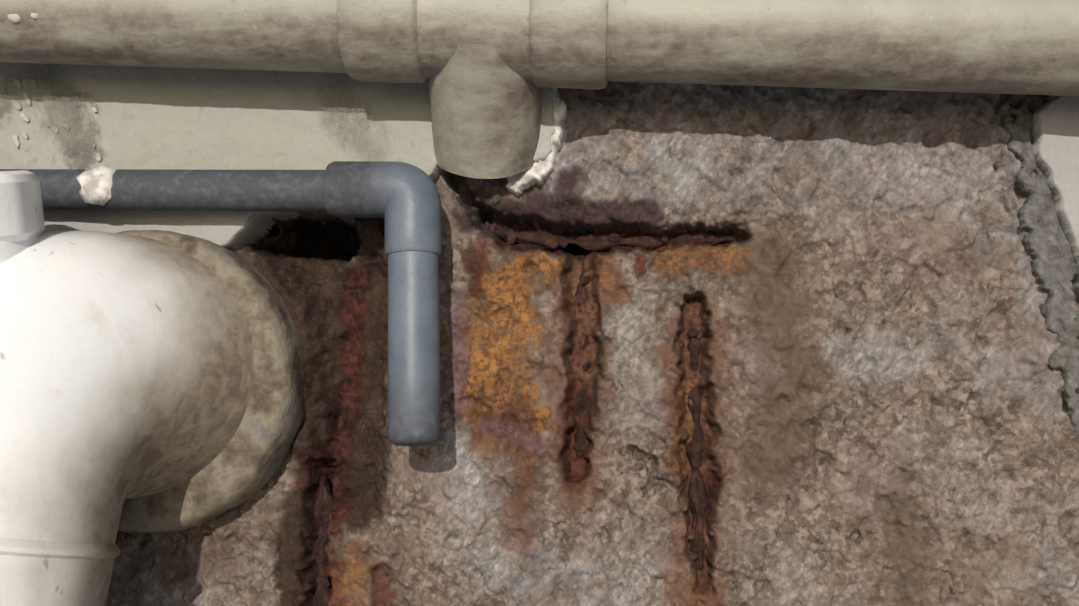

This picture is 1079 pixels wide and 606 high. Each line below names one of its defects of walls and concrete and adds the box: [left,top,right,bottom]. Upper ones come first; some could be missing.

corrosion [241,218,394,606]
spalling [105,81,1079,606]
corrosion [451,166,753,500]
corrosion [656,298,722,606]